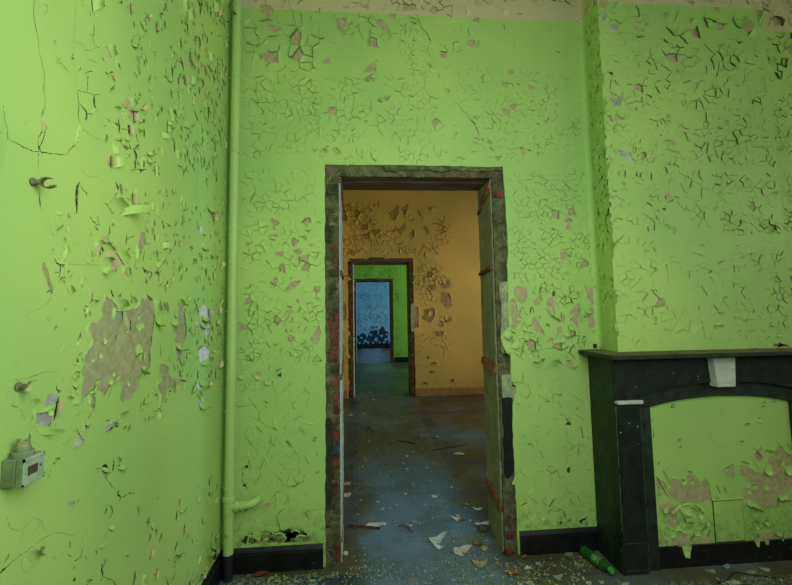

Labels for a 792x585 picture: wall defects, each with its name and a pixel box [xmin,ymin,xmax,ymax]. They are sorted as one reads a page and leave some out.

crack [3,5,147,173]
crack [75,171,99,214]
peeling [24,0,237,451]
peeling [227,0,632,585]
peeling [655,445,792,558]